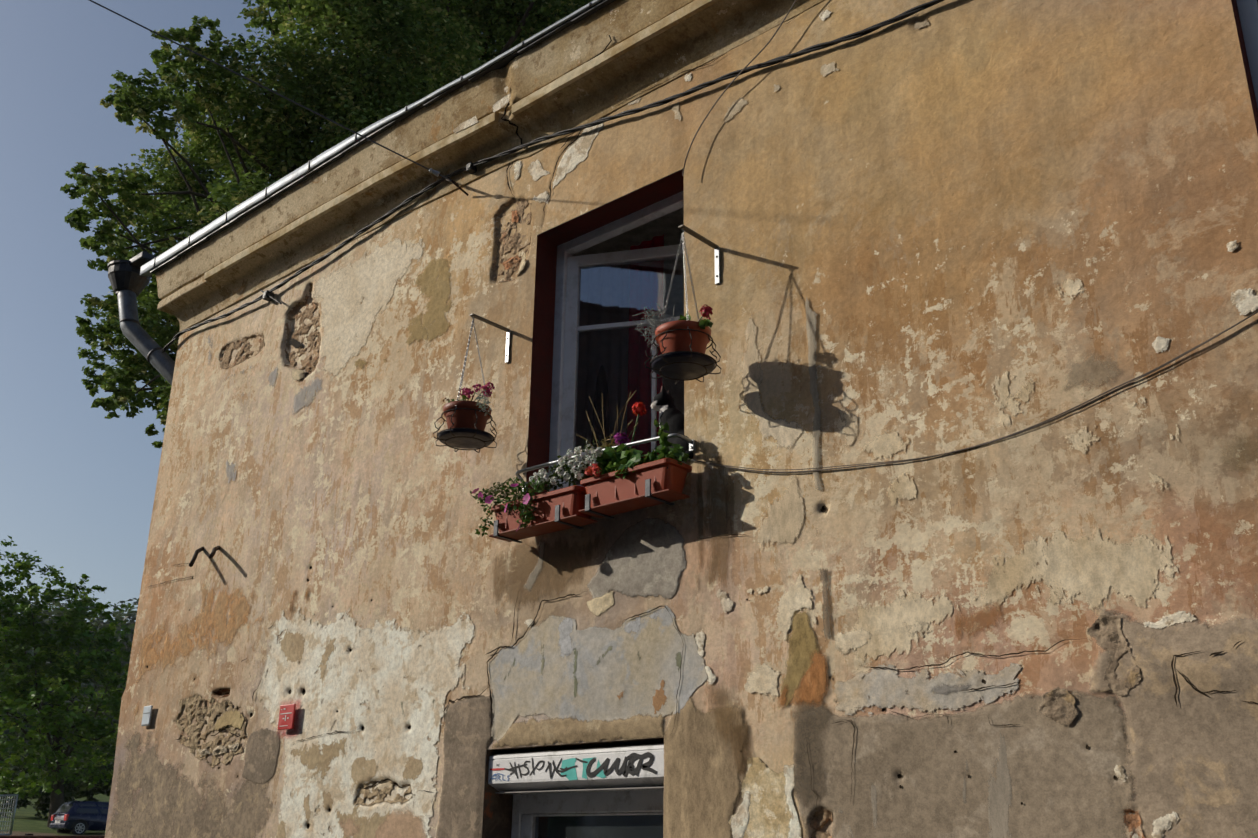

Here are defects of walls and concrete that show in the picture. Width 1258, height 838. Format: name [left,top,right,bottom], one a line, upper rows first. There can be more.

crack [501,101,525,197]
spalling [492,123,603,282]
spalling [207,333,265,378]
peeling [268,238,425,414]
spalling [173,689,246,768]
peeling [257,606,475,838]
peeling [488,591,716,741]
crack [870,638,1089,723]
crack [1171,641,1258,705]
peeling [728,757,833,838]